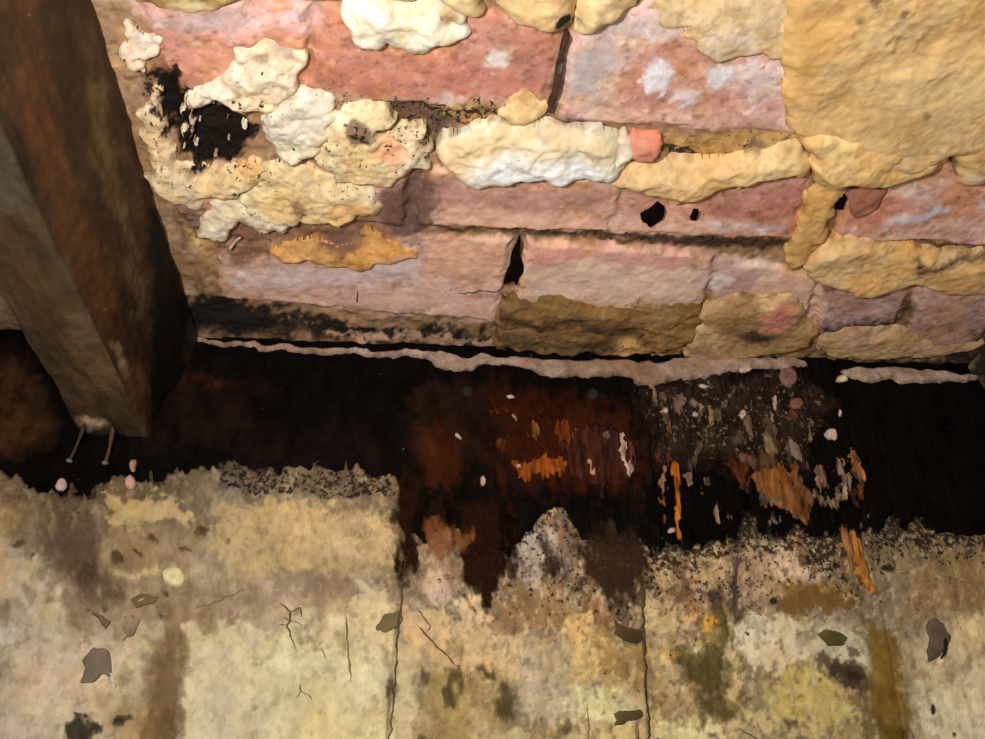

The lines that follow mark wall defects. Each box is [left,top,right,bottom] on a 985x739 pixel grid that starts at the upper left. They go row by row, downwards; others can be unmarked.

damp [146,63,260,172]
peeling [80,647,116,689]
crack [388,552,461,739]
damp [390,461,522,613]
damp [541,539,562,576]
damp [577,520,651,610]
crack [637,550,651,739]
damp [644,466,790,545]
damp [770,585,852,617]
damp [822,494,863,536]
peeling [926,618,951,662]
damp [65,712,131,739]